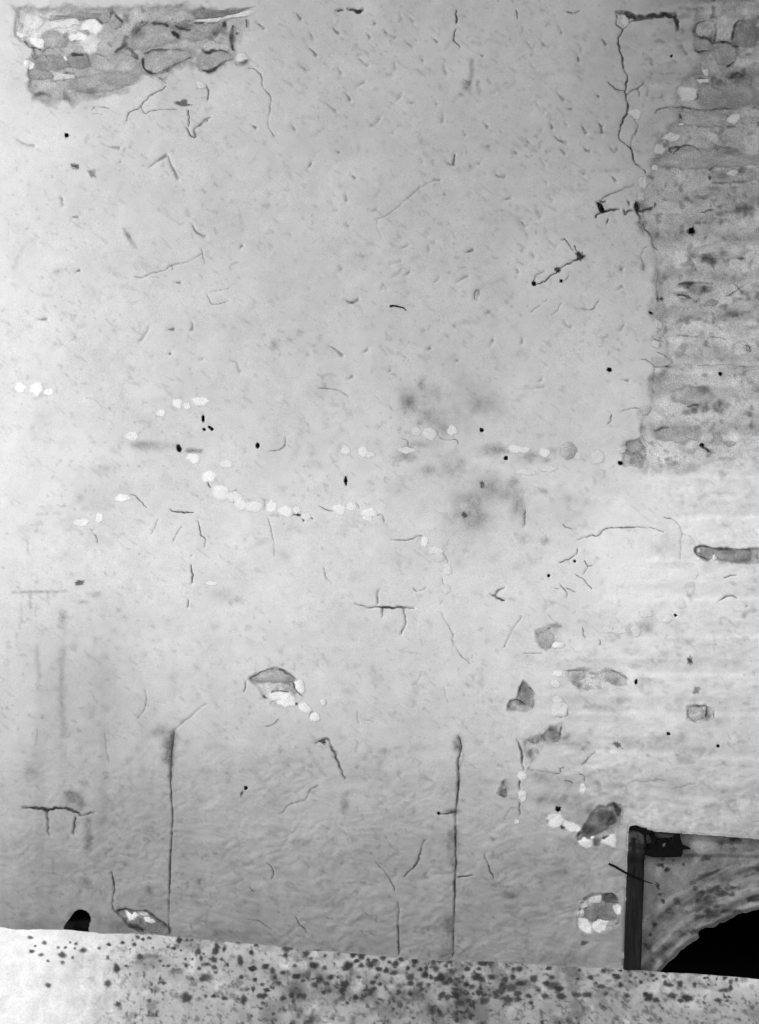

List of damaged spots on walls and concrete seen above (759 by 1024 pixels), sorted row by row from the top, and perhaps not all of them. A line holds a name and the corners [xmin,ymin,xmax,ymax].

spalling [14,5,255,106]
crack [609,12,741,173]
crack [560,527,660,593]
spalling [694,545,759,564]
spalling [507,681,534,712]
spalling [523,668,638,759]
crack [25,807,89,828]
crack [167,735,175,929]
crack [445,738,494,911]
spalling [546,803,624,849]
spalling [116,908,169,936]
spalling [577,893,622,944]